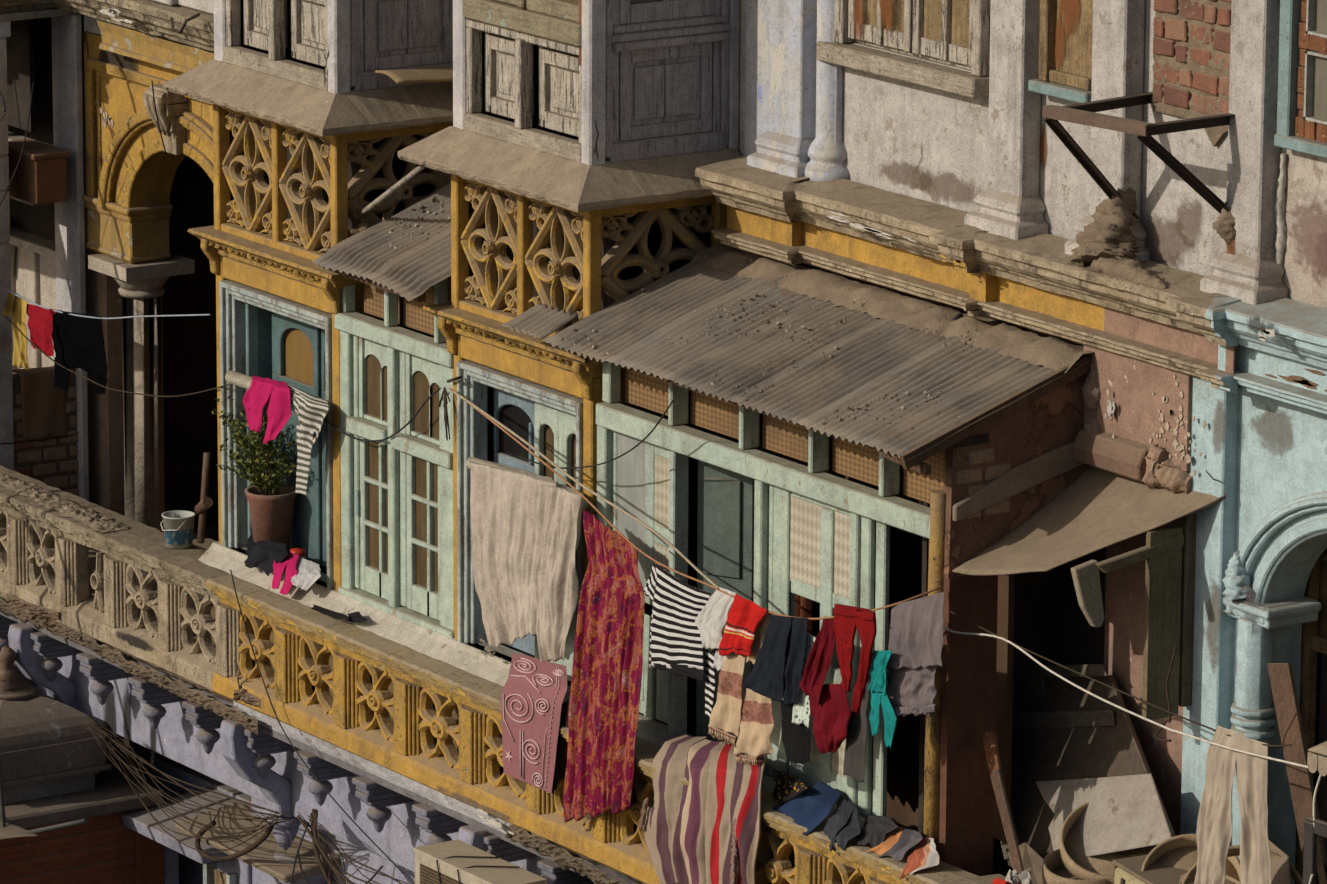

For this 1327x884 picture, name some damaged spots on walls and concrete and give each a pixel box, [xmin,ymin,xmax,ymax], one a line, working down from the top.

rust [1054,0,1080,69]
peeling [1105,388,1116,438]
spalling [1142,374,1206,494]